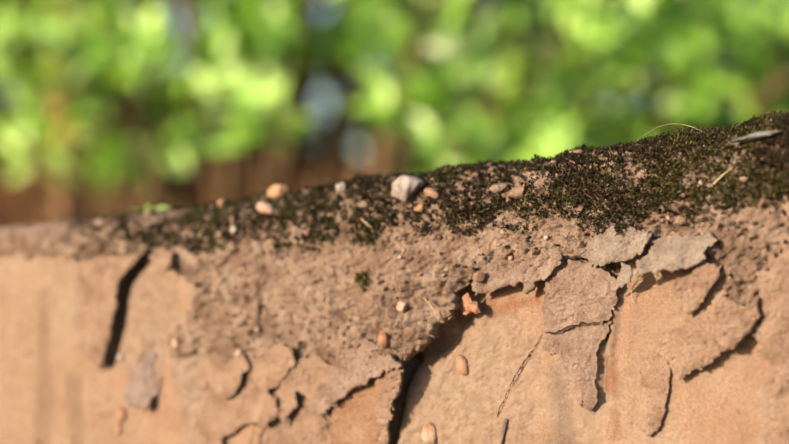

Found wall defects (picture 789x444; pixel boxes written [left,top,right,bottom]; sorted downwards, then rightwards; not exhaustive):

peeling [191,339,405,444]
crack [498,322,604,414]
peeling [460,226,789,444]